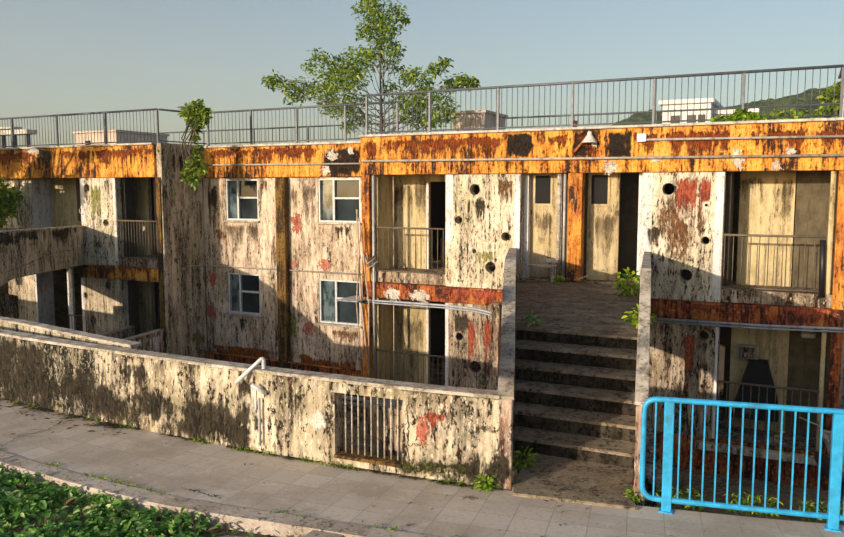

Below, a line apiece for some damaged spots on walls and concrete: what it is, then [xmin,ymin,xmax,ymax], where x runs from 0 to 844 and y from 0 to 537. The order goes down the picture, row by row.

corrosion [55,148,152,168]
corrosion [210,147,316,164]
peeling [320,147,354,176]
corrosion [367,136,505,160]
corrosion [544,134,597,157]
corrosion [633,131,740,162]
corrosion [751,130,805,152]
water stain [468,199,485,222]
water stain [0,228,76,246]
corrosion [214,345,273,359]
water stain [0,335,262,450]
peeling [416,415,430,446]